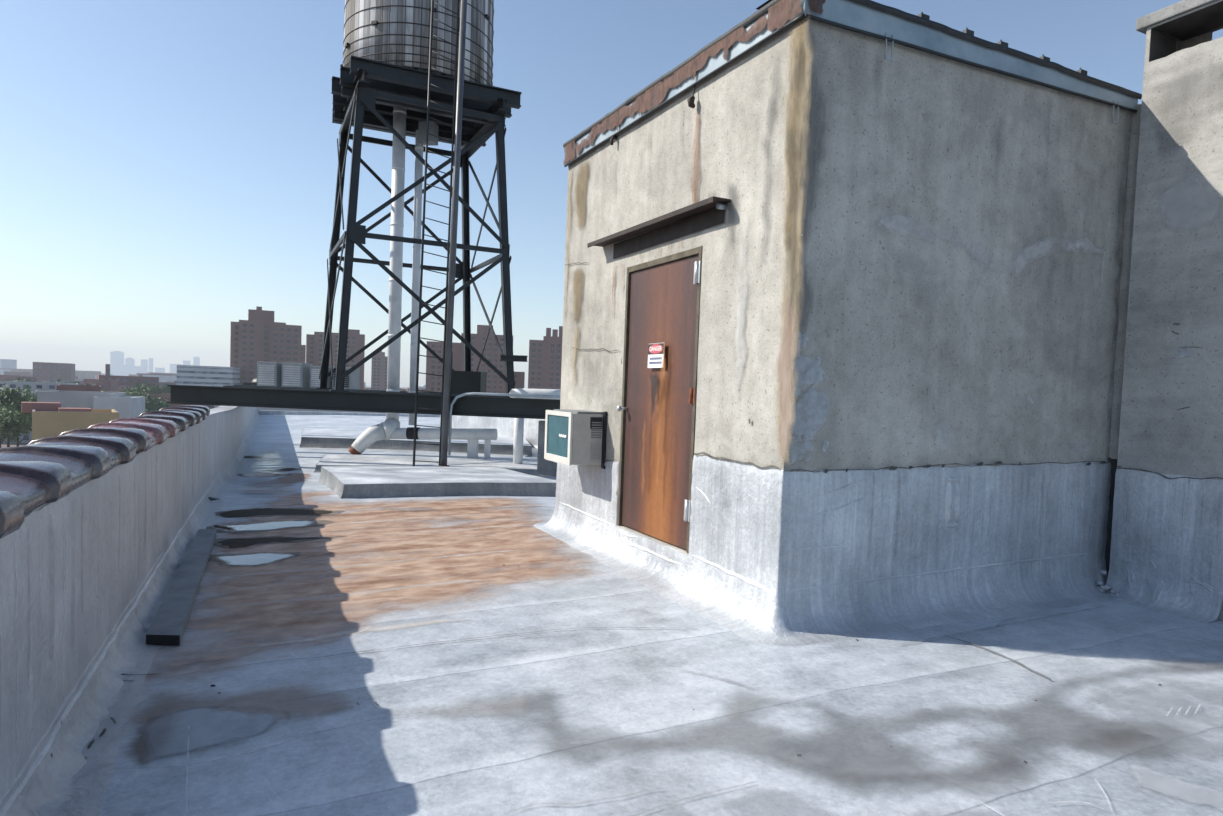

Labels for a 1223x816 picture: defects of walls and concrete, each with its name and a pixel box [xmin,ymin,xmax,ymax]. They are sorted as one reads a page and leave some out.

corrosion [564,0,825,461]
peeling [790,331,829,464]